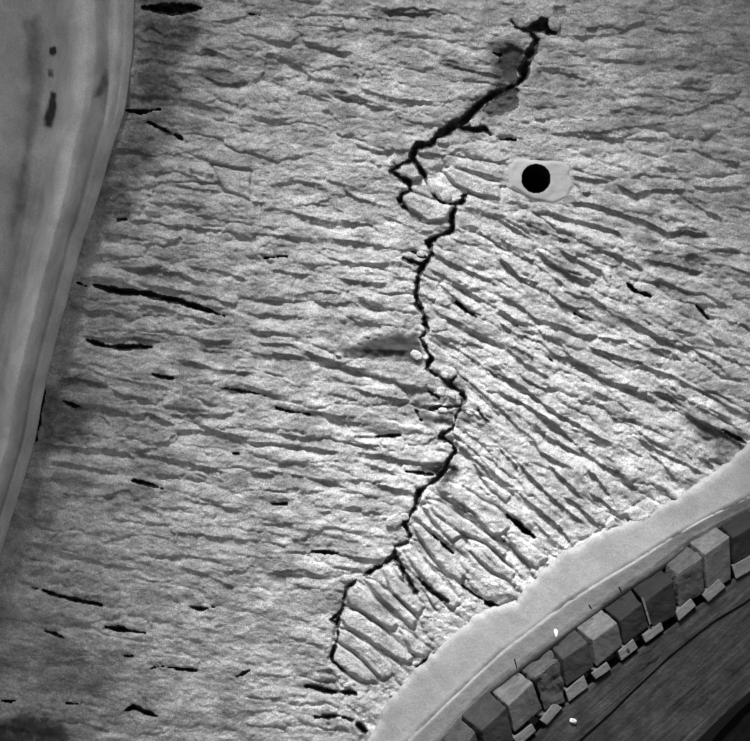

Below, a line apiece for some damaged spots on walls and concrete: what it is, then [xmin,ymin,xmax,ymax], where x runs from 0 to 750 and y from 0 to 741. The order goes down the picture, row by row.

crack [304,15,561,696]
crack [313,714,368,734]